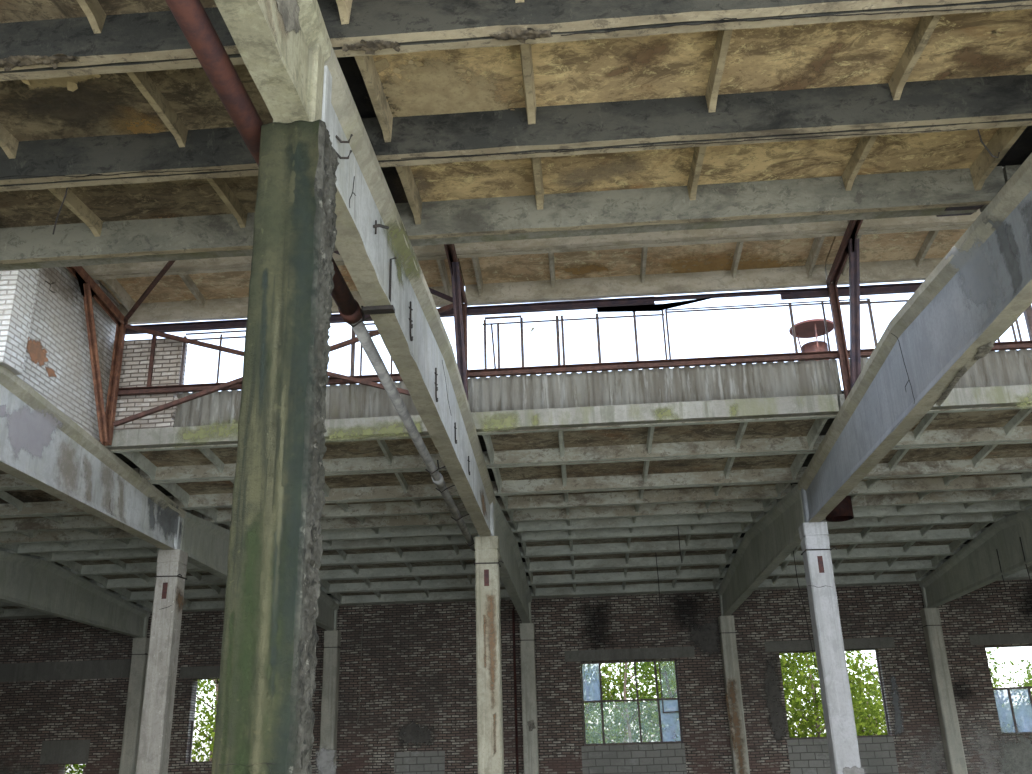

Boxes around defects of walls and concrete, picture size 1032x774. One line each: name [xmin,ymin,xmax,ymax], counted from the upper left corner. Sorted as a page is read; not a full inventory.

spalling [490,27,552,43]
peeling [22,74,101,92]
peeling [34,349,57,377]
peeling [0,405,62,458]
water stain [253,143,318,774]
rust [483,596,496,754]
rust [726,680,745,774]